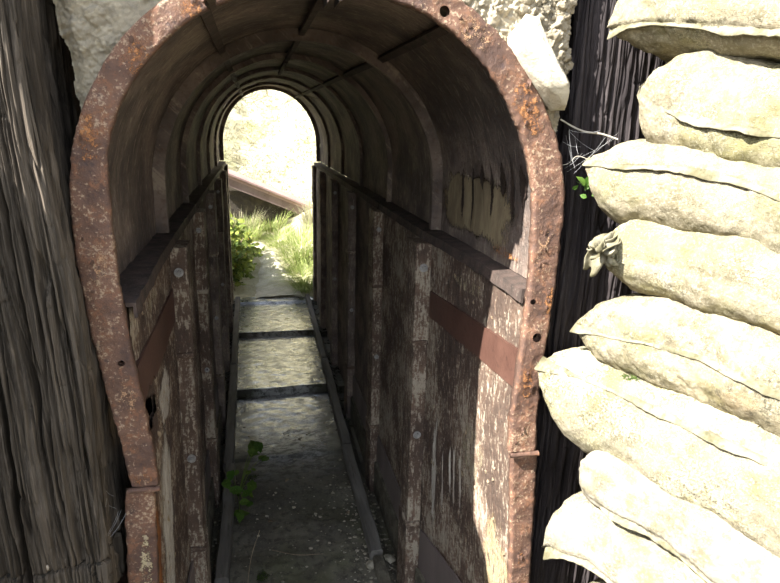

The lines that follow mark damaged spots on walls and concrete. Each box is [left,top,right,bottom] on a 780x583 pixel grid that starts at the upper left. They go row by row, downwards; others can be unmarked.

corrosion [511,79,545,141]